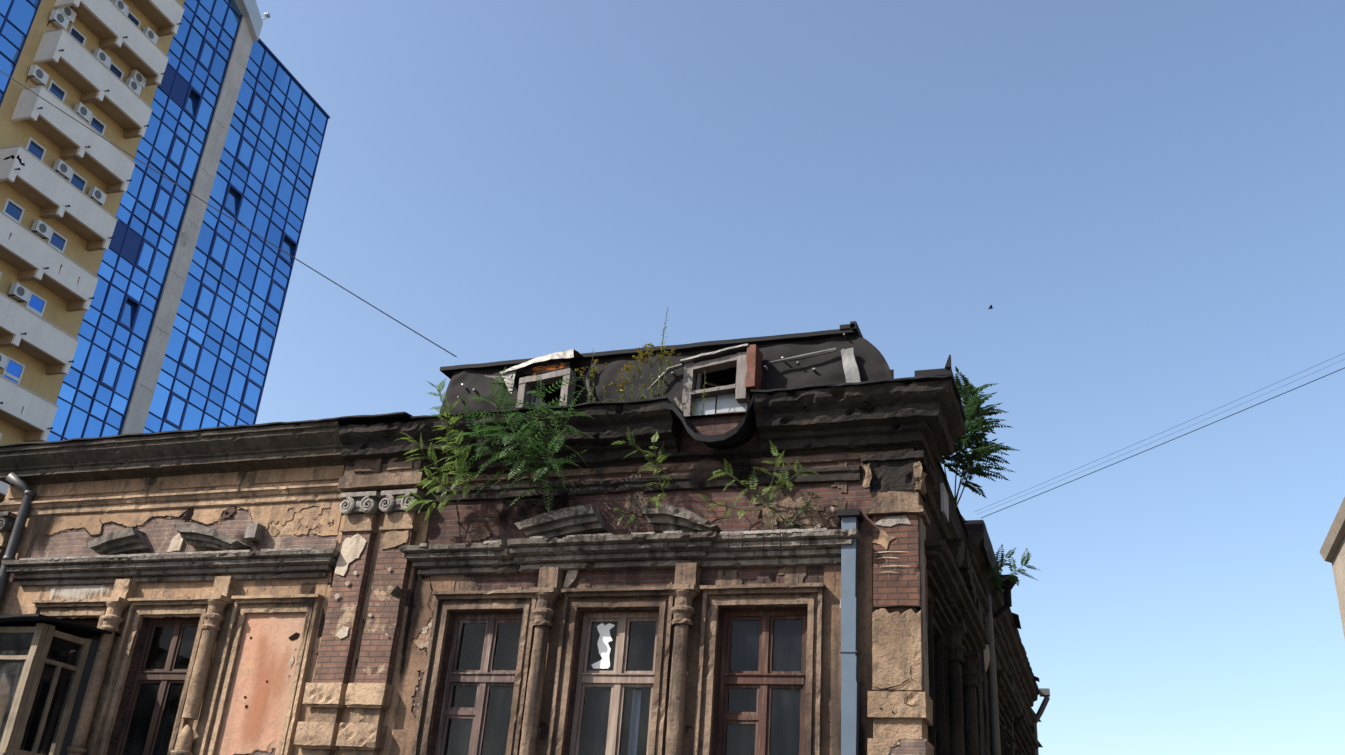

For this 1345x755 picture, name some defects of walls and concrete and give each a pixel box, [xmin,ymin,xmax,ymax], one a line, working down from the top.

flaking render [25,506,337,558]
flaking render [235,745,277,755]